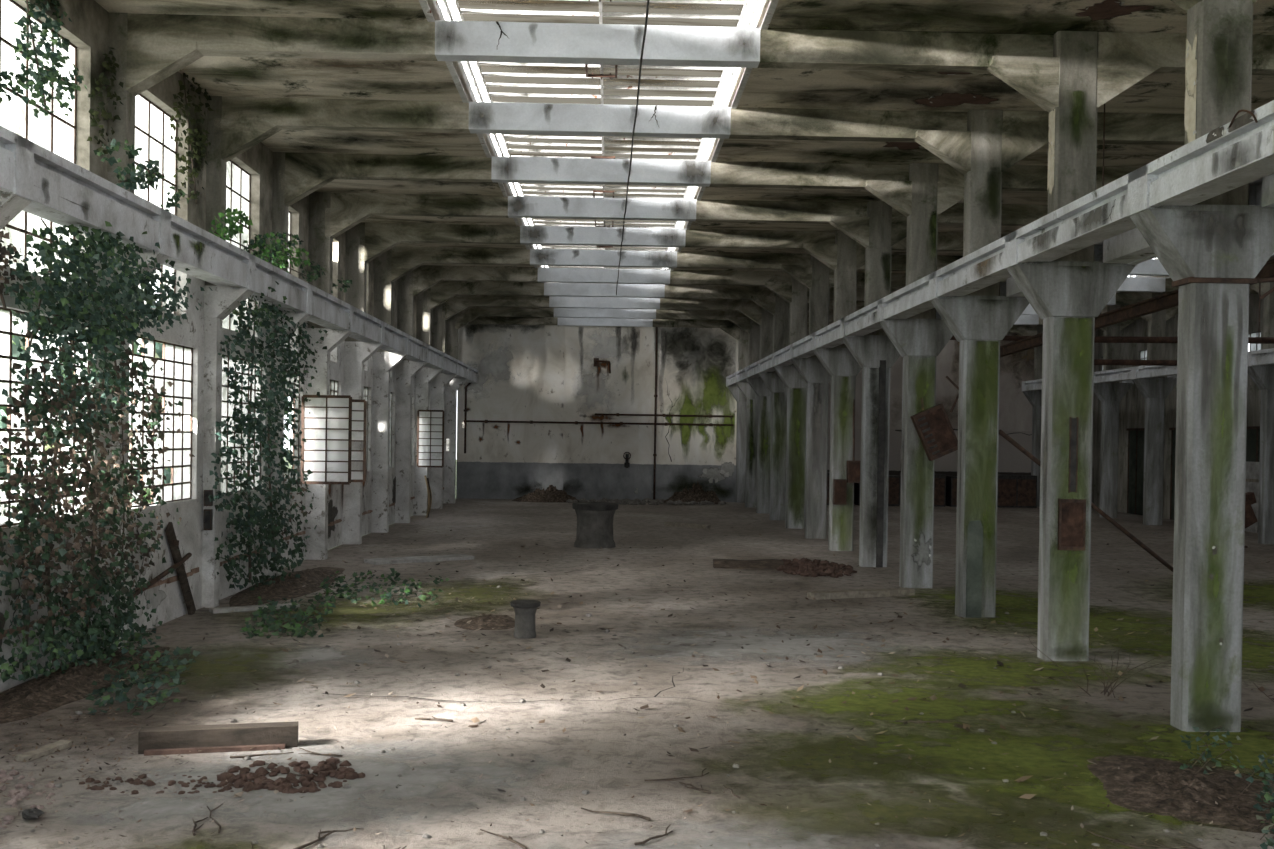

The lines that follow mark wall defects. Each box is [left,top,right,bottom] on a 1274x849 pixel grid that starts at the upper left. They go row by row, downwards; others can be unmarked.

leakage [262,0,425,90]
leakage [203,66,268,80]
leakage [976,80,1019,95]
leakage [261,103,307,114]
leakage [747,88,941,130]
leakage [407,156,474,184]
leakage [741,149,929,173]
leakage [736,194,877,215]
leakage [1073,195,1125,232]
leakage [662,330,730,390]
leakage [1201,297,1242,411]
leakage [665,414,735,454]